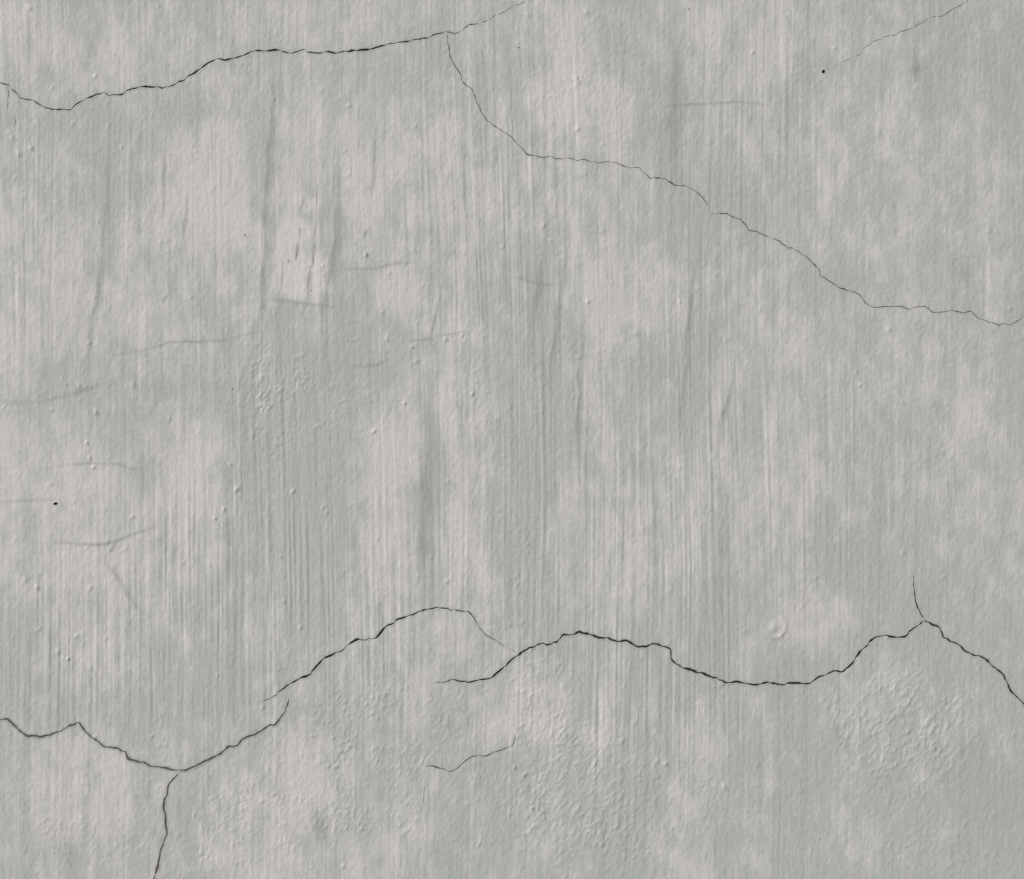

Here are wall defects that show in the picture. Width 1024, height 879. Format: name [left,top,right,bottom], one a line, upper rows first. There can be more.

crack [404,283,444,342]
crack [0,0,1024,328]
crack [0,570,1024,879]